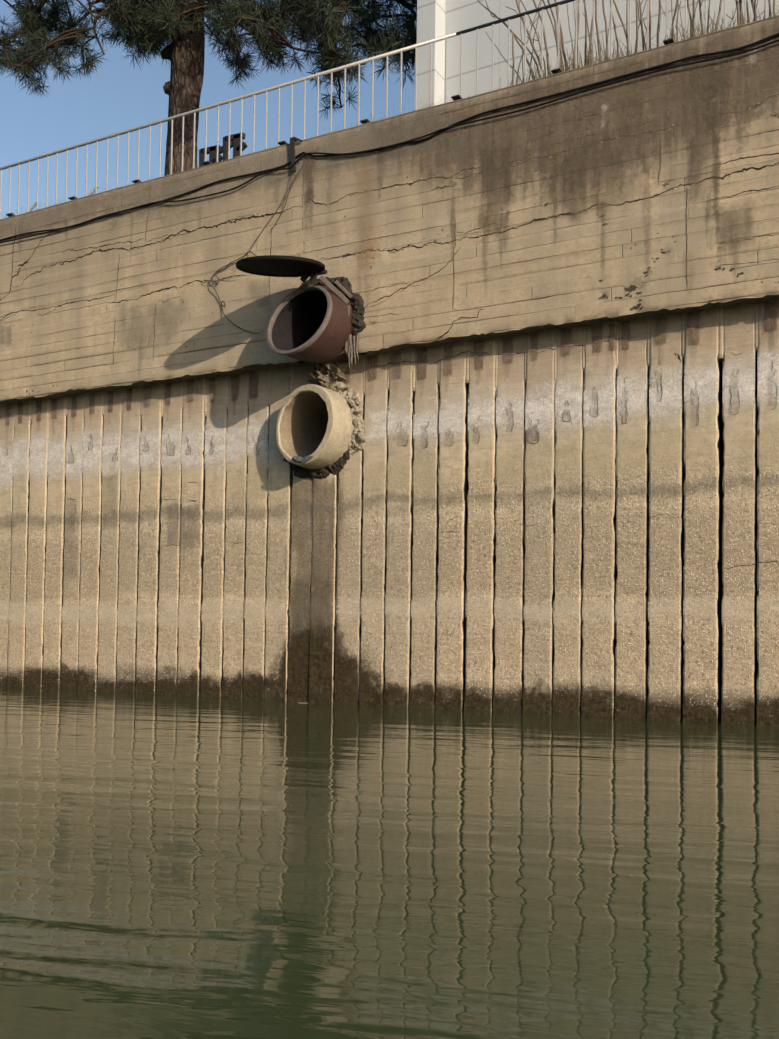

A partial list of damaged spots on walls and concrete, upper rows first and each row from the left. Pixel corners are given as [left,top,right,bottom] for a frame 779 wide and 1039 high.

crack [0,112,587,362]
crack [325,124,779,373]
water stain [380,19,779,223]
water stain [366,354,779,441]